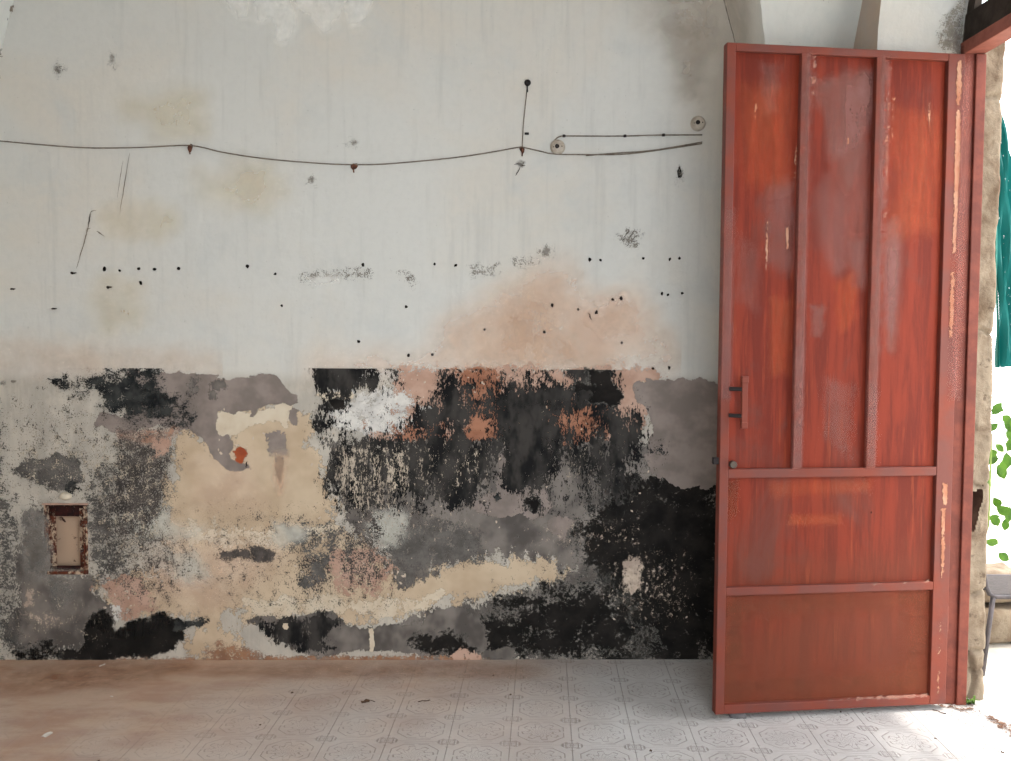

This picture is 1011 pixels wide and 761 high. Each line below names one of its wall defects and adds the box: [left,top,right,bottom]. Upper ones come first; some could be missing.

peeling [300,267,372,283]
leakage [317,382,432,439]
leakage [274,452,284,486]
leakage [0,368,205,660]
flaking render [11,361,699,660]
leakage [369,514,406,544]